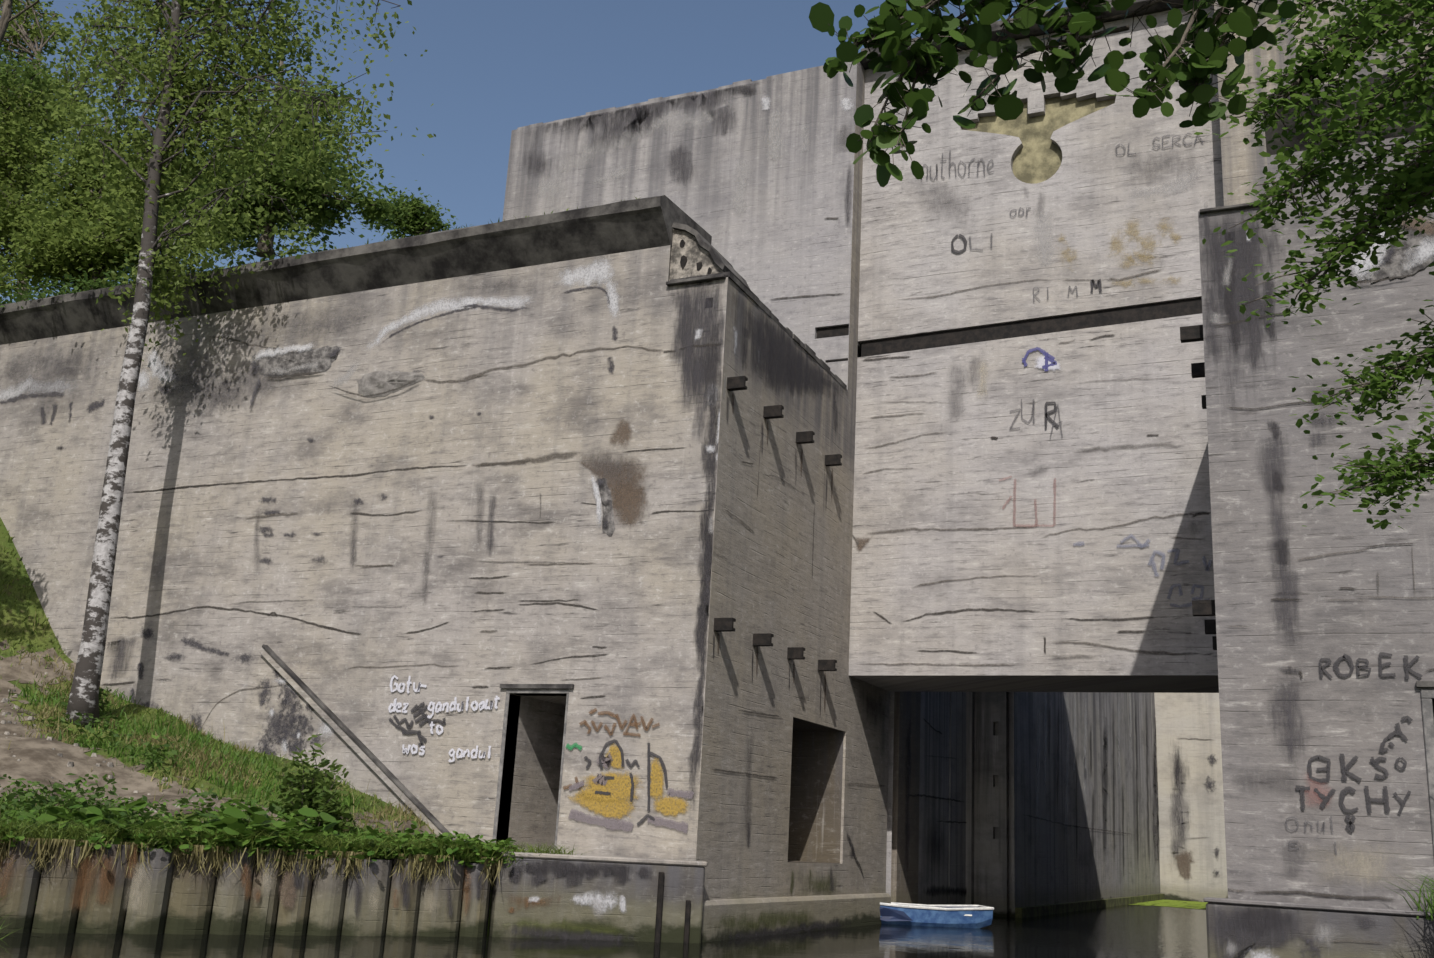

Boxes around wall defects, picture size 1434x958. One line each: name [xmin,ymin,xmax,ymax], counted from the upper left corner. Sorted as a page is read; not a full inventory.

water stain [1205,220,1275,359]
spalling [250,344,341,408]
crack [427,343,720,383]
crack [627,445,685,453]
crack [134,453,597,524]
water stain [582,461,645,524]
water stain [674,275,838,781]
water stain [1273,511,1297,632]
crack [115,561,597,668]
crack [473,646,607,699]
water stain [1076,713,1192,878]
rust [280,864,301,908]